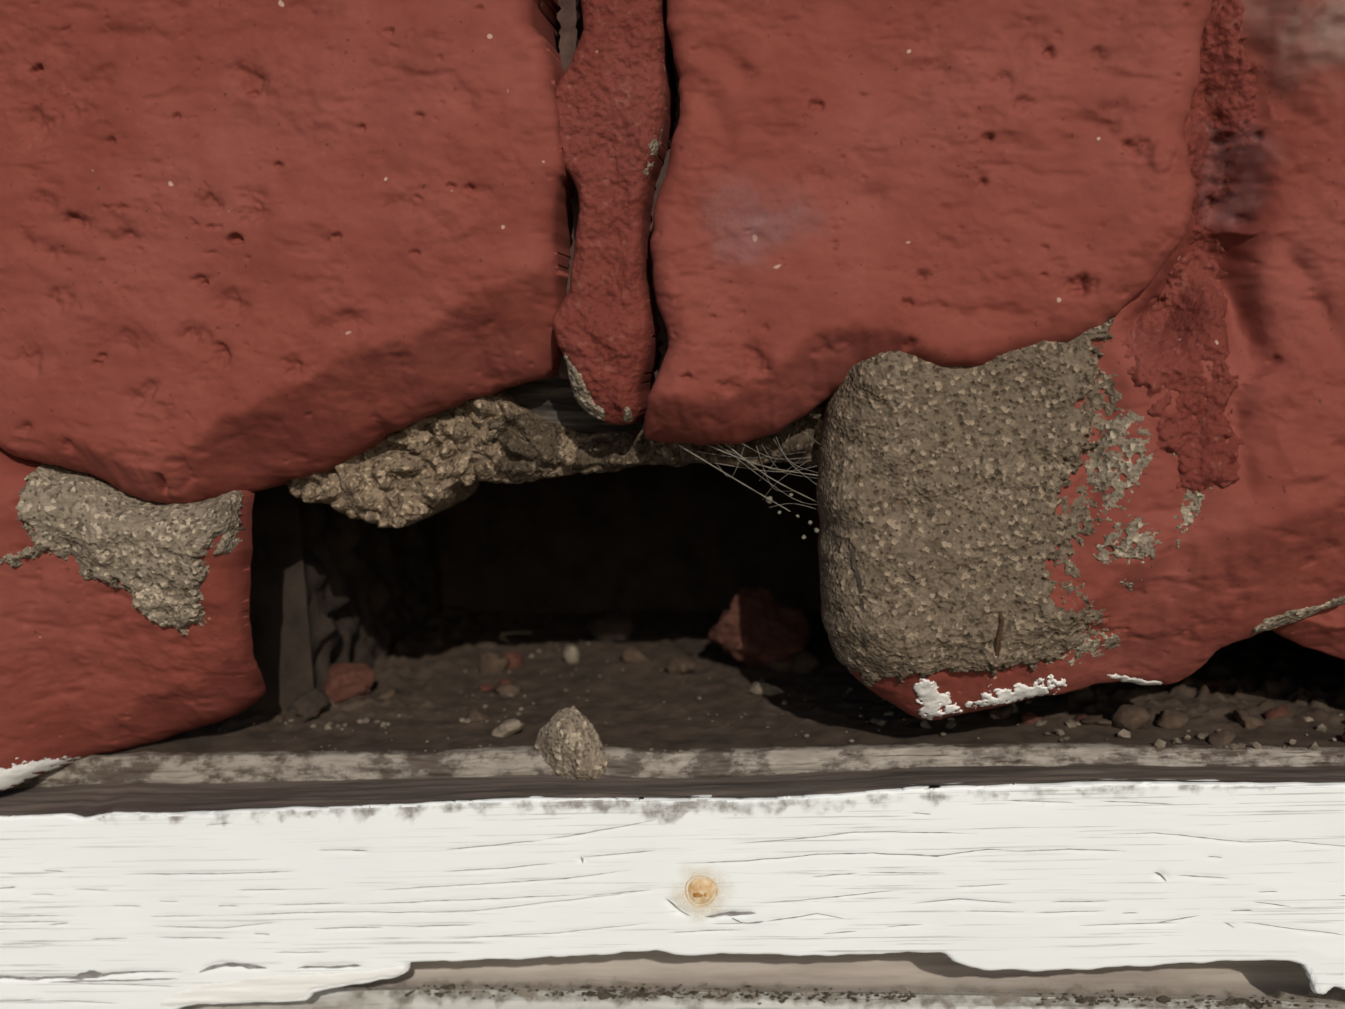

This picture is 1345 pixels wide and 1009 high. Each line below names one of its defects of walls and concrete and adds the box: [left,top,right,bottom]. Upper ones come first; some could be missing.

crack [557,0,580,73]
crack [567,186,579,294]
crack [650,34,680,387]
crack [559,353,569,379]
spalling [285,317,1213,688]
spalling [0,463,246,635]
peeling [6,746,558,790]
peeling [604,742,1345,778]
peeling [160,966,407,1007]